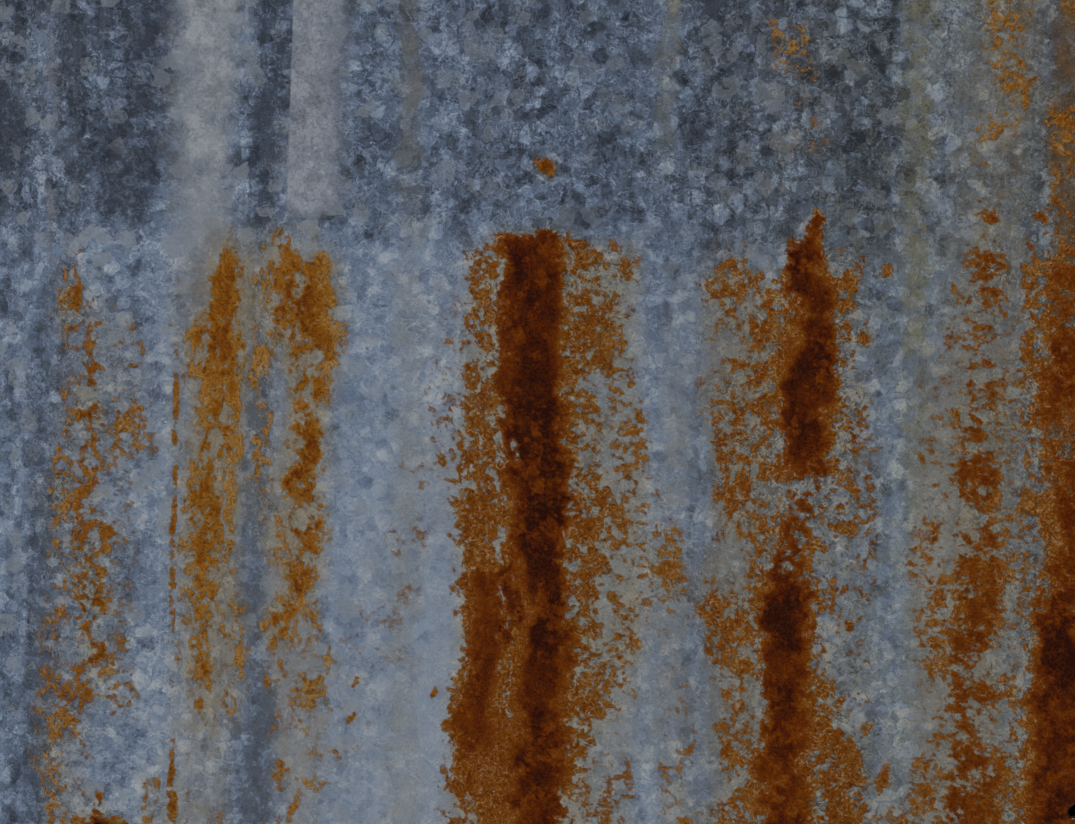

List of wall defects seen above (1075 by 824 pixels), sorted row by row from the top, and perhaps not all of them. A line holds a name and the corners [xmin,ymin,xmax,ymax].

rust [768,18,817,82]
rust [971,0,1039,167]
rust [28,265,158,824]
rust [168,226,348,759]
rust [400,100,1075,824]
rust [141,738,189,824]
rust [263,759,328,824]